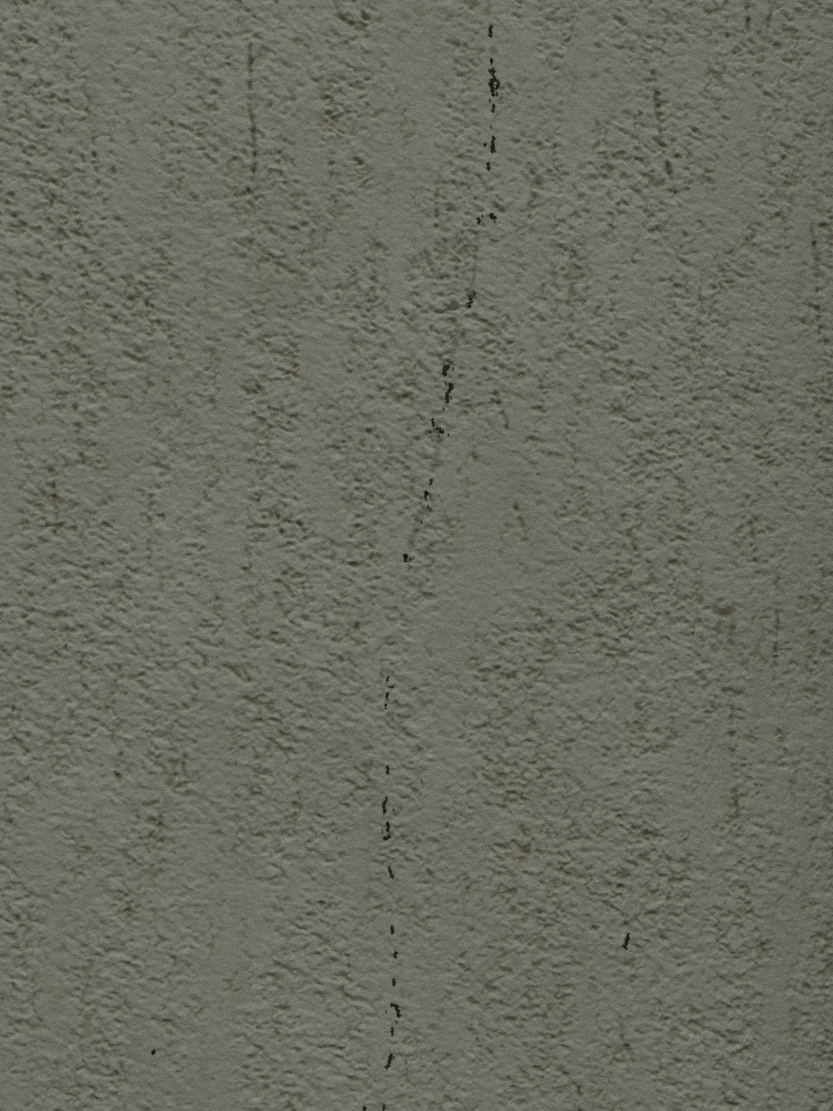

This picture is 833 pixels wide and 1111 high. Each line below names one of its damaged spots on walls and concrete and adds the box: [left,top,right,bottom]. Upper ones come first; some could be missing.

crack [483,25,500,170]
crack [476,213,497,224]
crack [430,364,454,437]
crack [420,479,433,524]
crack [384,675,394,709]
crack [381,766,395,879]
crack [384,925,401,1070]